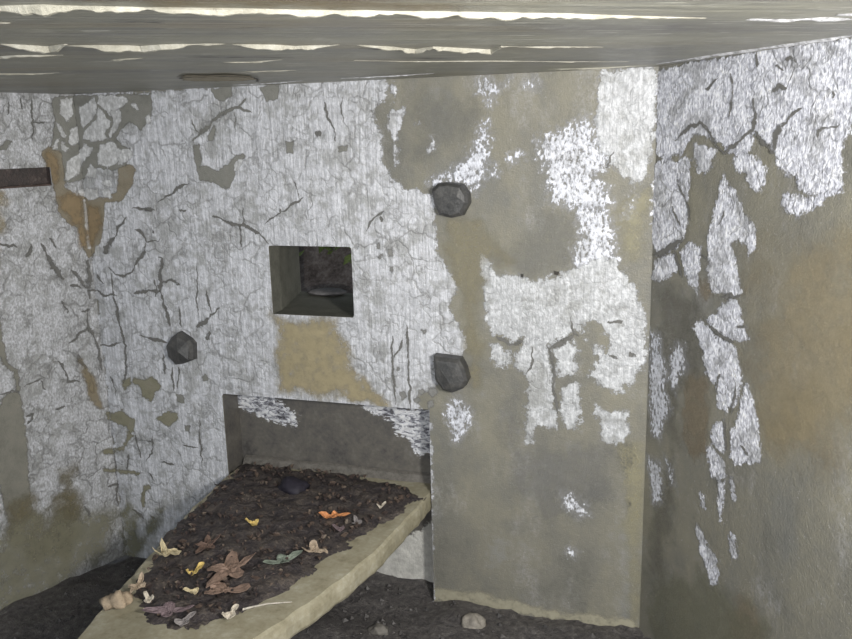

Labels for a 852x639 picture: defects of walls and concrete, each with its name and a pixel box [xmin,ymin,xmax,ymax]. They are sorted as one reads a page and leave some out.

crack [180,57,280,141]
crack [315,98,344,141]
corrosion [0,152,59,189]
corrosion [58,193,102,247]
crack [212,182,304,247]
crack [0,183,220,396]
peeling [478,37,852,522]
peeling [42,75,524,599]
crack [390,327,412,409]
damp [120,503,163,557]
peeling [695,524,720,585]
peeling [727,531,739,559]